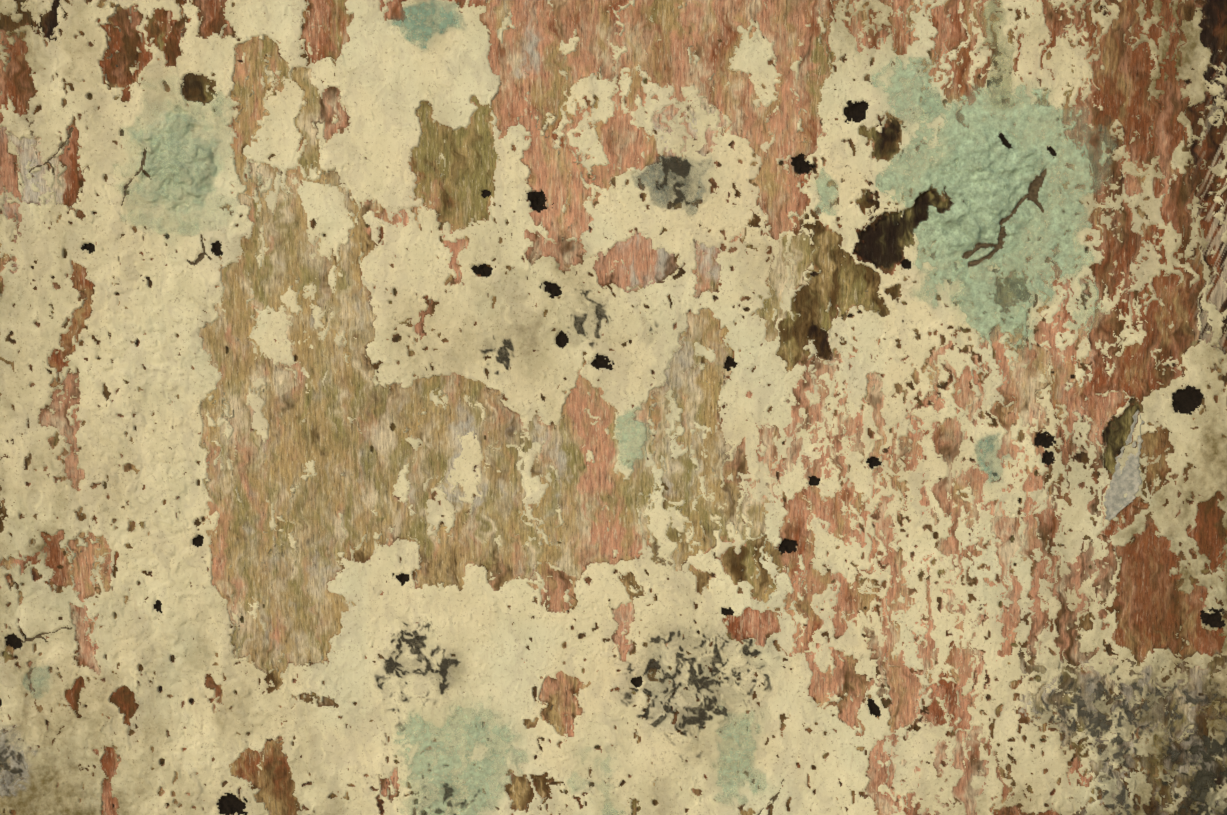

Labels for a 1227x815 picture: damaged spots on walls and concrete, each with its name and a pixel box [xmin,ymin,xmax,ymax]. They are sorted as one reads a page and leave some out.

spalling [667,177,719,209]
spalling [120,226,167,288]
spalling [97,379,143,444]
spalling [118,454,145,490]
spalling [610,687,652,744]
spalling [647,659,706,738]
spalling [765,713,791,758]
water stain [1041,664,1227,815]
peeling [483,767,659,815]
spalling [796,752,829,795]